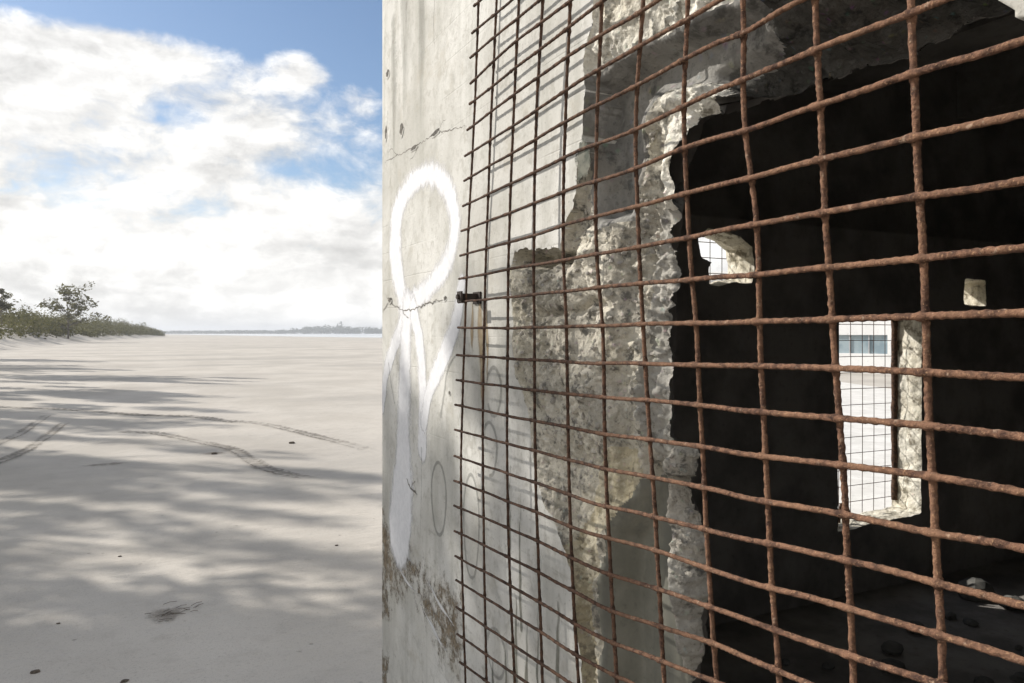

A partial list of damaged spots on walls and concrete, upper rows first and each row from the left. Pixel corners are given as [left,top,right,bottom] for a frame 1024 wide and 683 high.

spalling [583,0,734,76]
crack [386,120,465,161]
crack [383,298,442,318]
corrosion [470,304,488,398]
spalling [509,82,736,683]